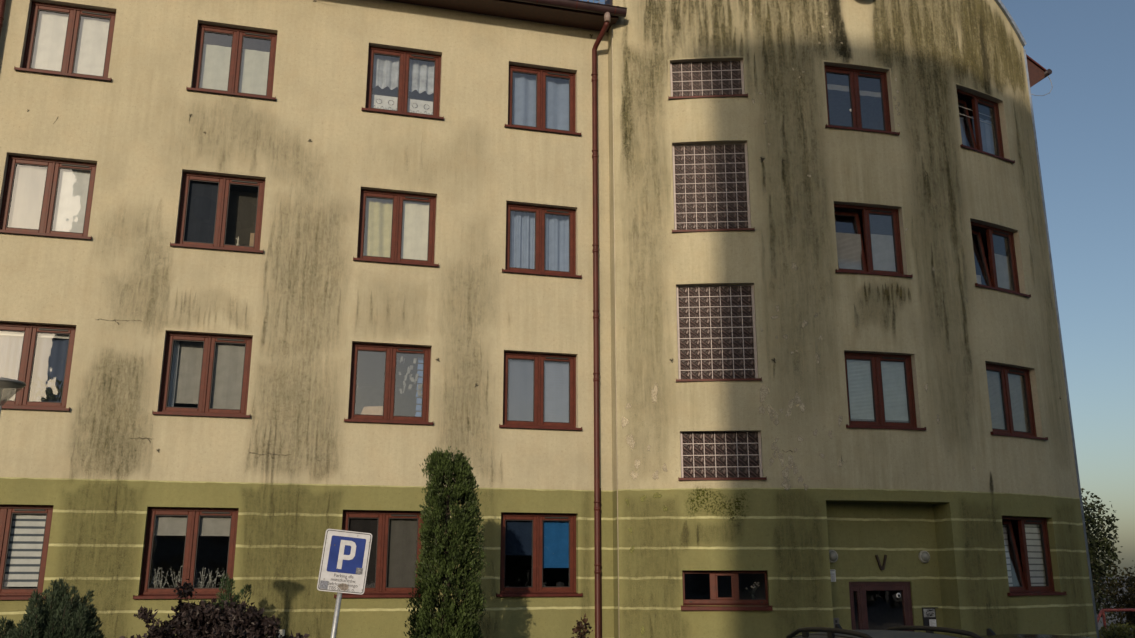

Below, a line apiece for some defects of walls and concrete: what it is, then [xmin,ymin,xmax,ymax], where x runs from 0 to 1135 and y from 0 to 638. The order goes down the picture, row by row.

leakage [622,64,632,149]
leakage [644,0,851,120]
leakage [874,0,1025,244]